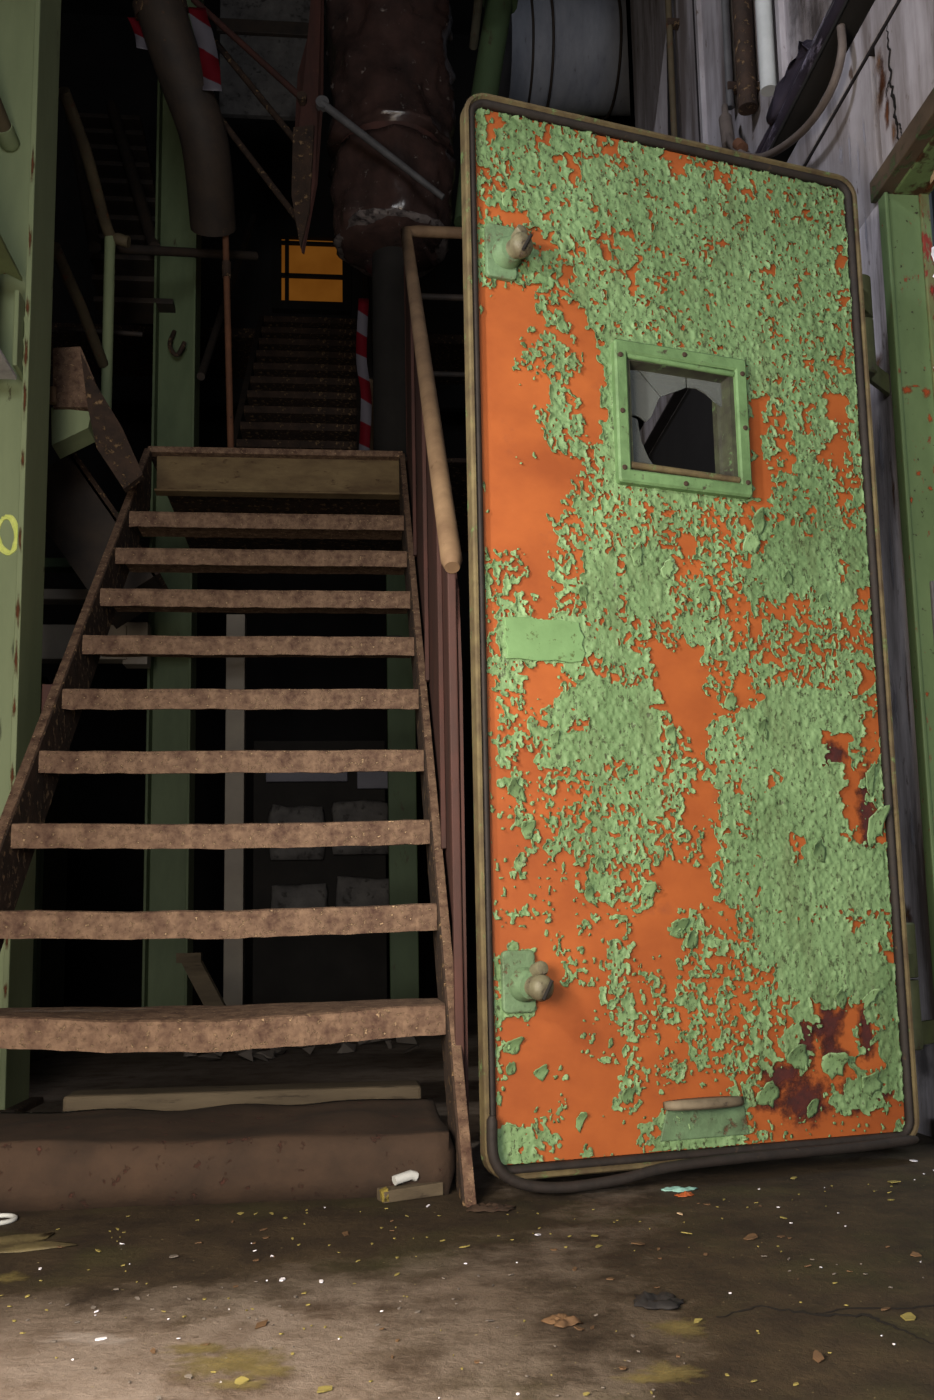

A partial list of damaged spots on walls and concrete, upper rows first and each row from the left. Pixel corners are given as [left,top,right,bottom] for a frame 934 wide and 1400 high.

peeling [475,108,905,1165]
rust [822,742,847,765]
rust [855,763,876,848]
rust [758,1006,874,1126]